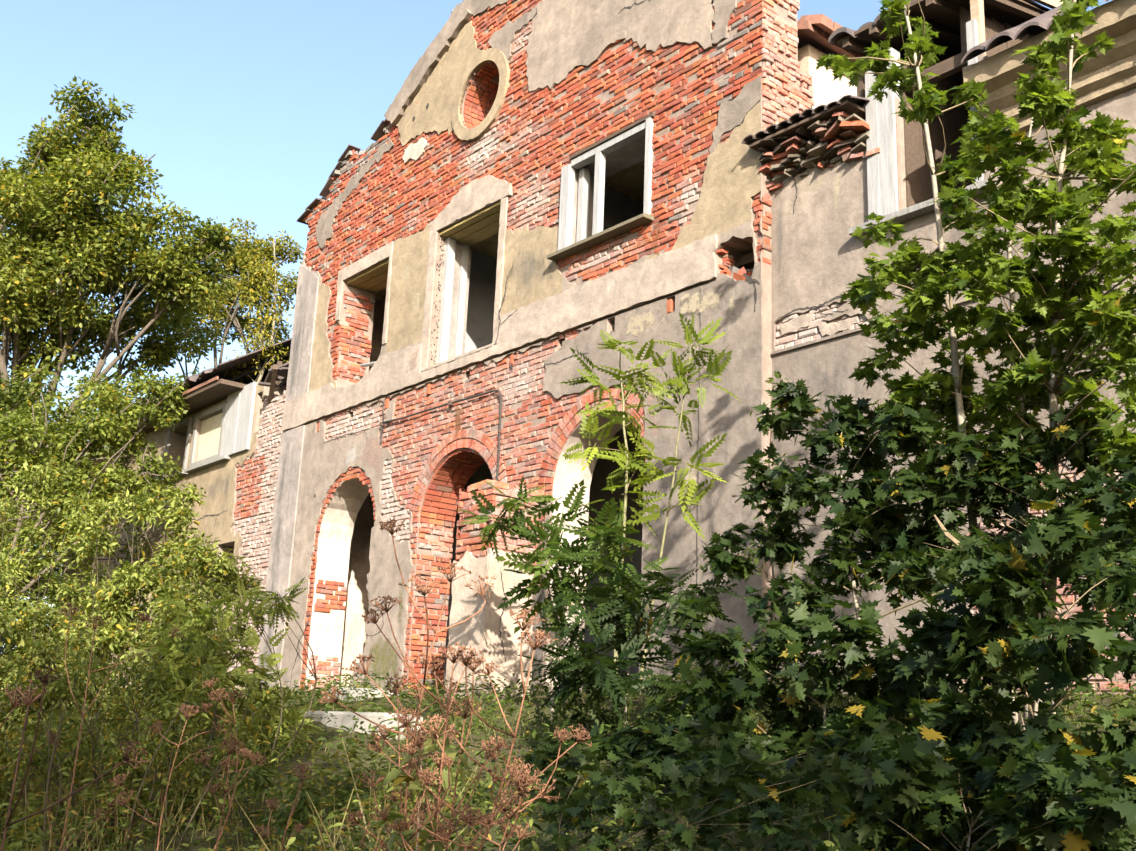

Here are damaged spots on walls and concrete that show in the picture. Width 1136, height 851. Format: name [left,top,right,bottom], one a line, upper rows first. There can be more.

flaking render [299,0,814,692]
flaking render [774,302,870,351]
flaking render [229,391,286,690]